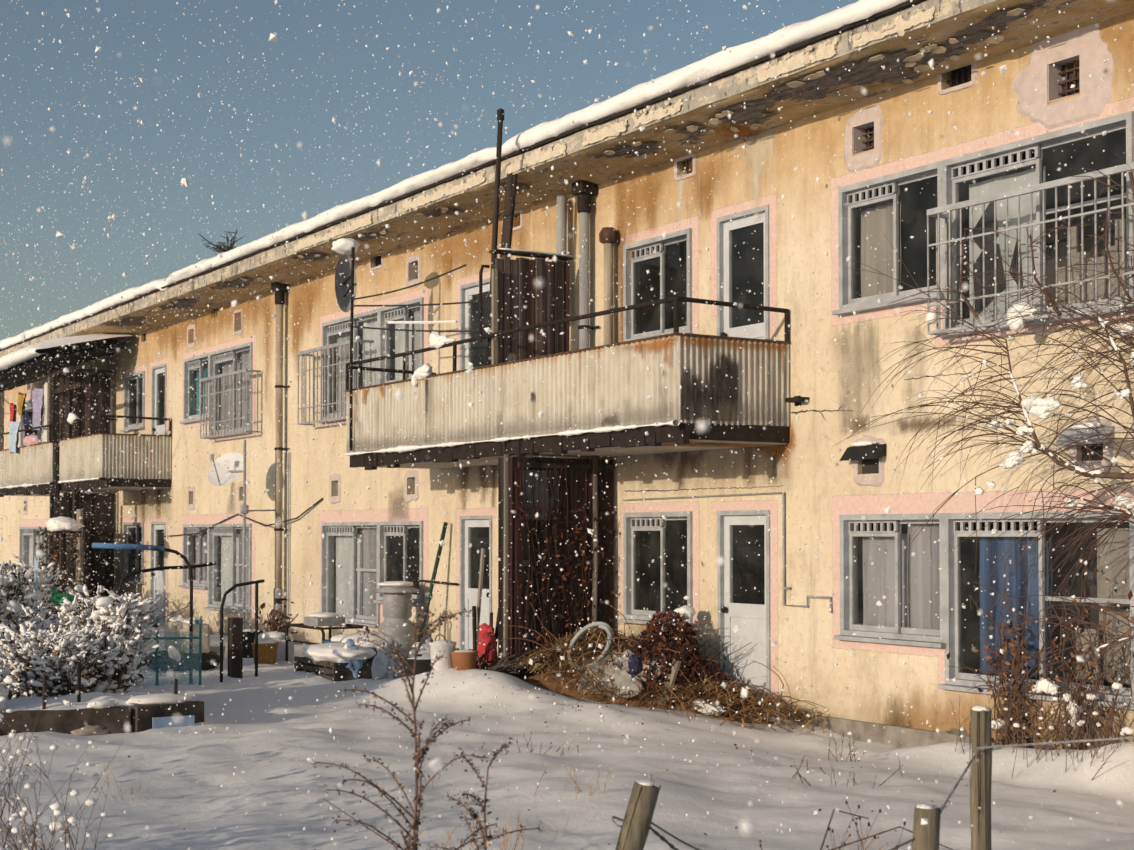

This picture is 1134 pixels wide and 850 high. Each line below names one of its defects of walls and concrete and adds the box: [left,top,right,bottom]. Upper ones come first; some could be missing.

spalling [582,0,1049,161]
peeling [402,143,566,219]
corrosion [634,338,786,368]
damp [682,355,738,421]
damp [900,421,949,430]